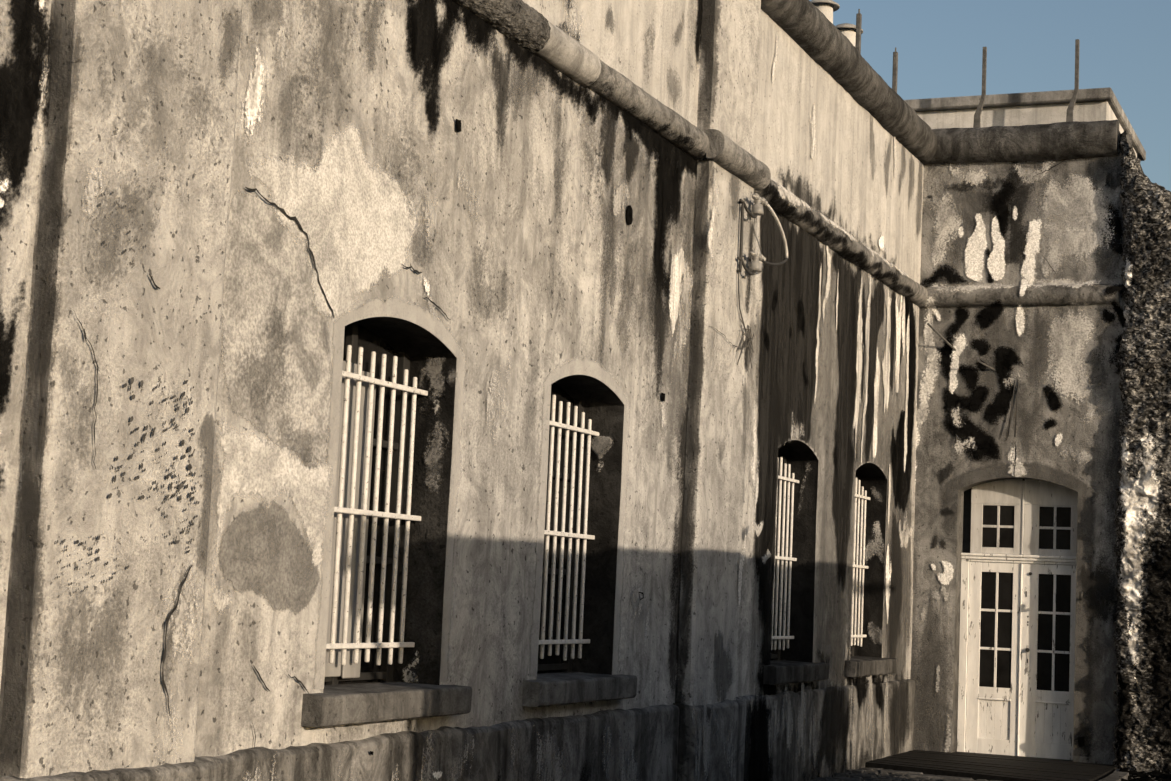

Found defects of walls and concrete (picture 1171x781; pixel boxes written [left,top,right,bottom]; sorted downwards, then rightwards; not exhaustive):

damp [0,0,85,780]
crack [162,565,193,716]
damp [365,0,382,70]
damp [406,0,739,781]
damp [738,114,1063,781]
damp [1095,204,1132,375]